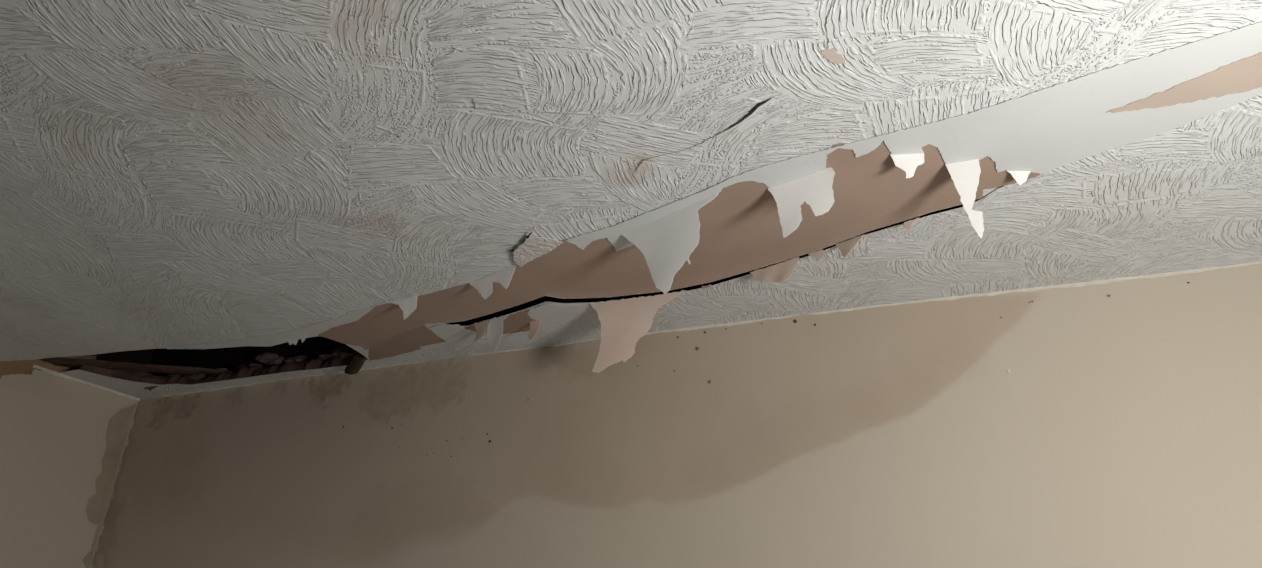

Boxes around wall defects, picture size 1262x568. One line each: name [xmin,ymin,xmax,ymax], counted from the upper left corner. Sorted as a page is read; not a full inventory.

peeling [170,22,1262,373]
flaking render [0,355,97,379]
damp [92,290,1046,568]